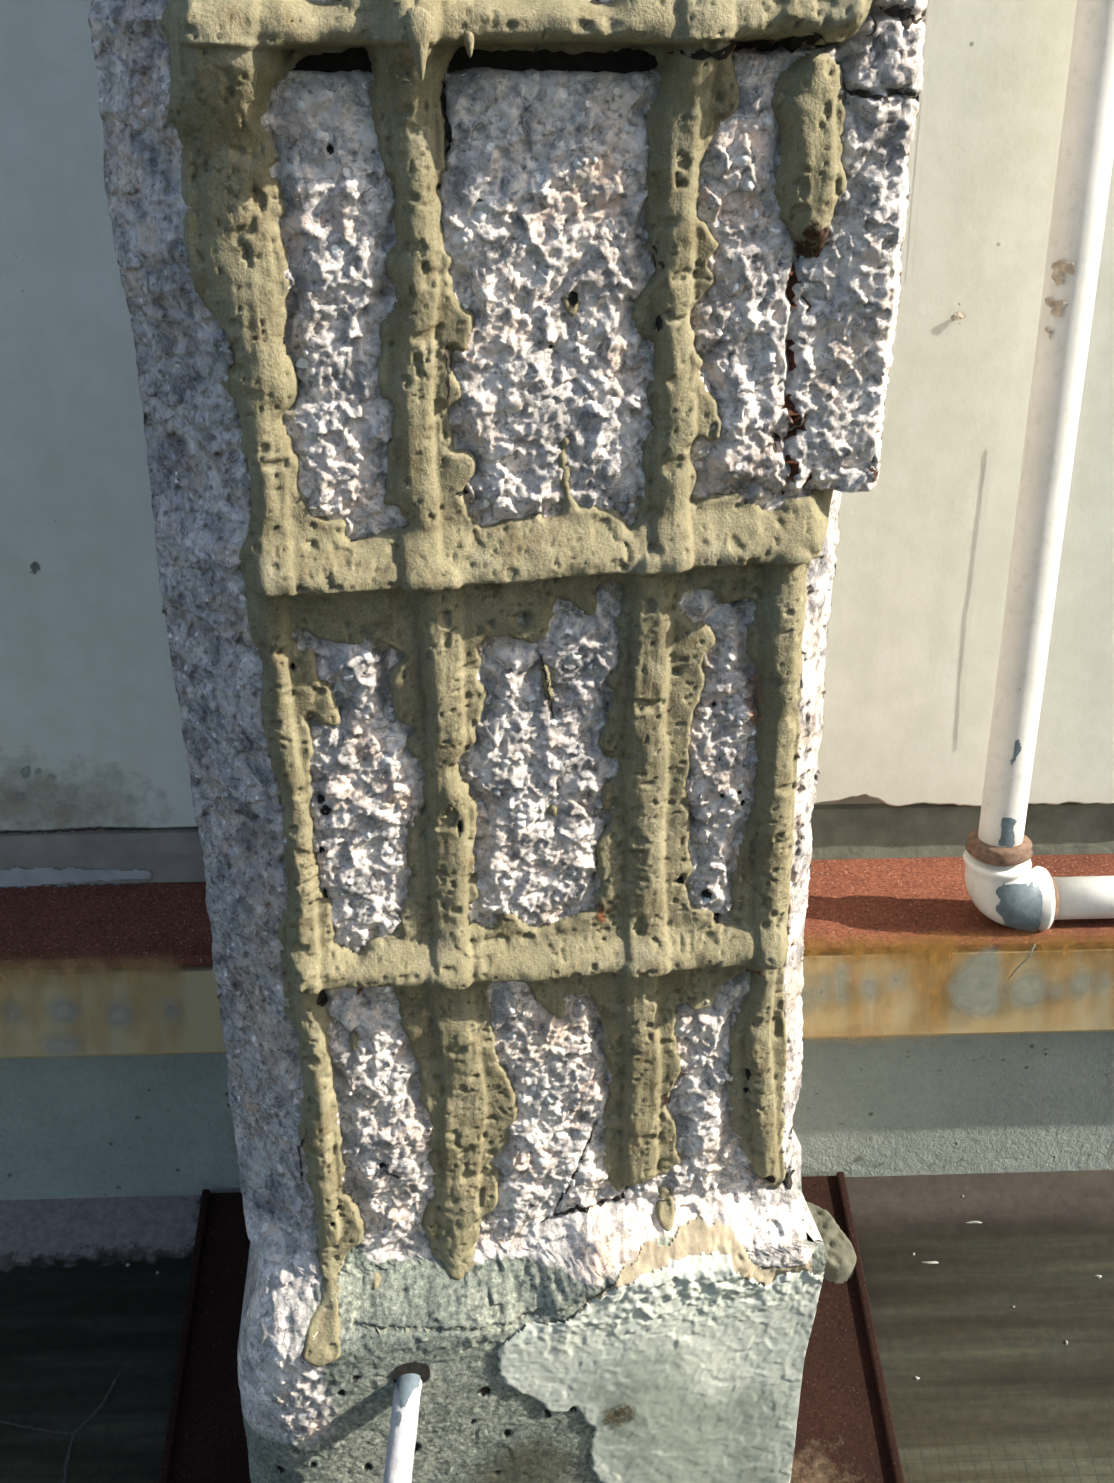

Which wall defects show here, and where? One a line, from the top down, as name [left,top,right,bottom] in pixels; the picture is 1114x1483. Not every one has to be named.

corrosion [794,221,830,259]
crack [772,258,813,495]
spalling [88,0,436,1244]
spalling [437,32,841,1483]
peeling [0,866,152,887]
crack [540,1122,630,1223]